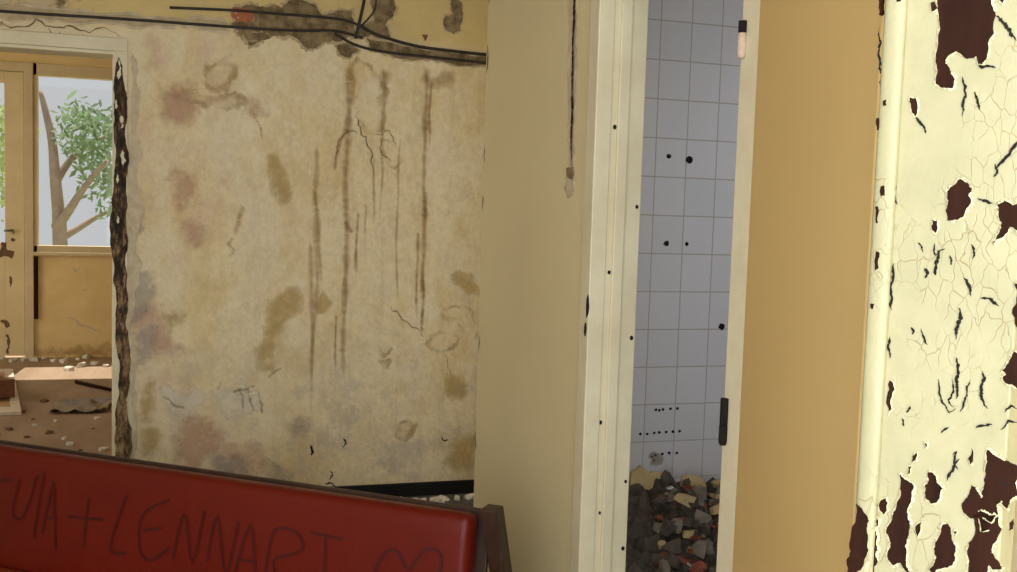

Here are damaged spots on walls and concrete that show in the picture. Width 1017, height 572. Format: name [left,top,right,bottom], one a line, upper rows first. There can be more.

flaking render [0,0,488,73]
peeling [930,0,1005,91]
crack [995,15,1016,40]
peeling [908,96,920,118]
crack [961,65,996,117]
crack [977,142,1017,204]
peeling [930,177,974,235]
peeling [992,198,1017,246]
flaking render [109,54,143,459]
crack [887,327,927,357]
peeling [846,442,945,572]
peeling [927,448,1017,572]